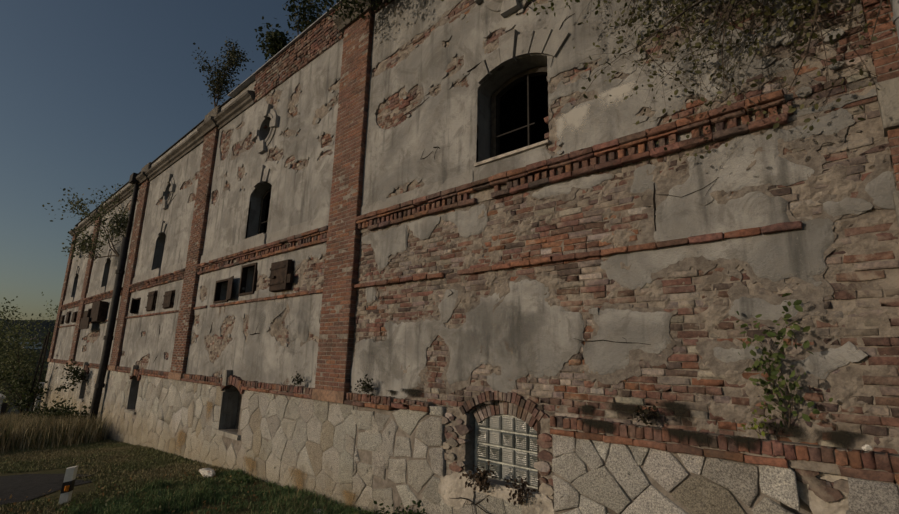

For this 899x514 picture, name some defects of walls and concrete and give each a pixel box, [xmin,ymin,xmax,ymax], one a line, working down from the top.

flaking render [264,78,340,173]
flaking render [210,124,256,205]
crack [649,161,719,232]
flaking render [291,252,326,293]
flaking render [351,0,899,514]
flaking render [191,313,250,363]
flaking render [265,303,290,348]